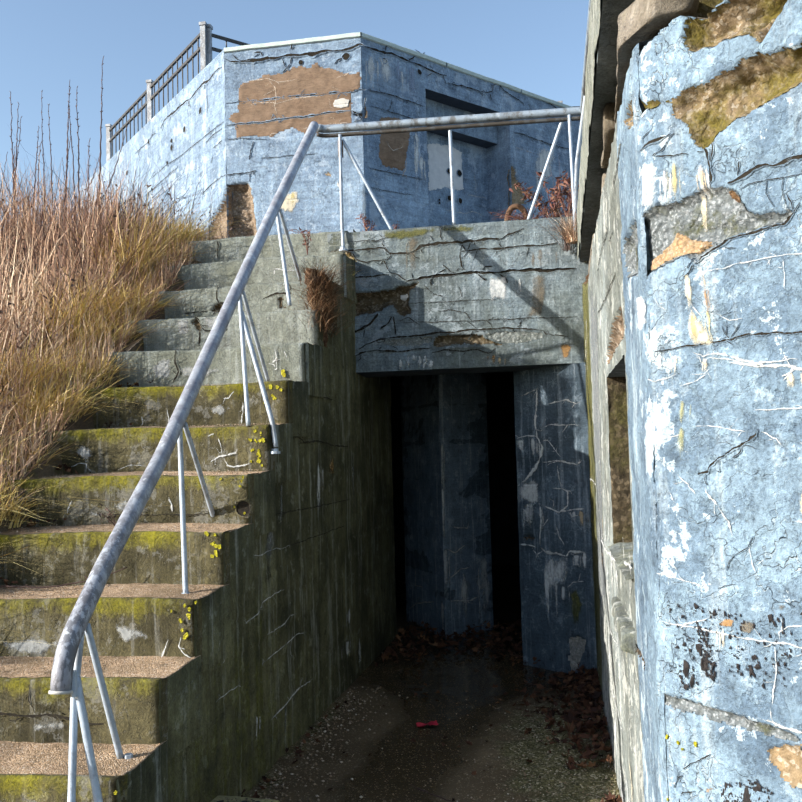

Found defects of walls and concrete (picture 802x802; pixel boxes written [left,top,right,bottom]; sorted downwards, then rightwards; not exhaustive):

peeling [229,62,367,139]
spalling [621,0,802,149]
spalling [211,184,257,239]
spalling [622,186,792,280]
crack [345,227,577,361]
spalling [607,306,624,364]
crack [648,314,802,389]
crack [515,389,596,587]
crack [657,421,780,589]
crack [660,617,802,733]
crack [674,754,711,802]
spalling [664,694,802,788]